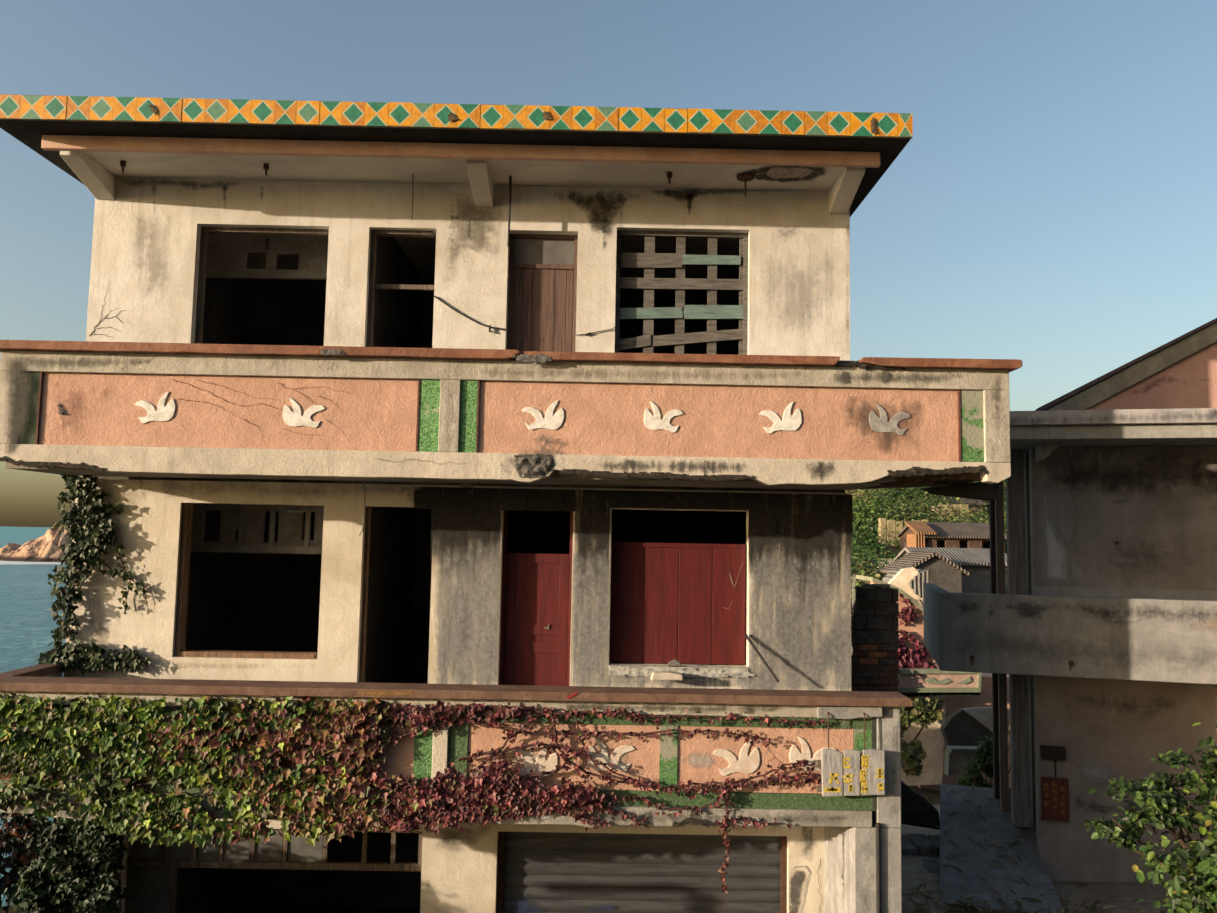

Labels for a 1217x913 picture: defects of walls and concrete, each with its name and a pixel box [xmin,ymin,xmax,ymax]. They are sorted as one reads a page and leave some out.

leakage [451,201,493,255]
leakage [567,192,626,245]
crack [89,283,126,337]
crack [173,379,352,446]
crack [378,389,466,466]
spalling [514,454,754,481]
spalling [887,465,988,477]